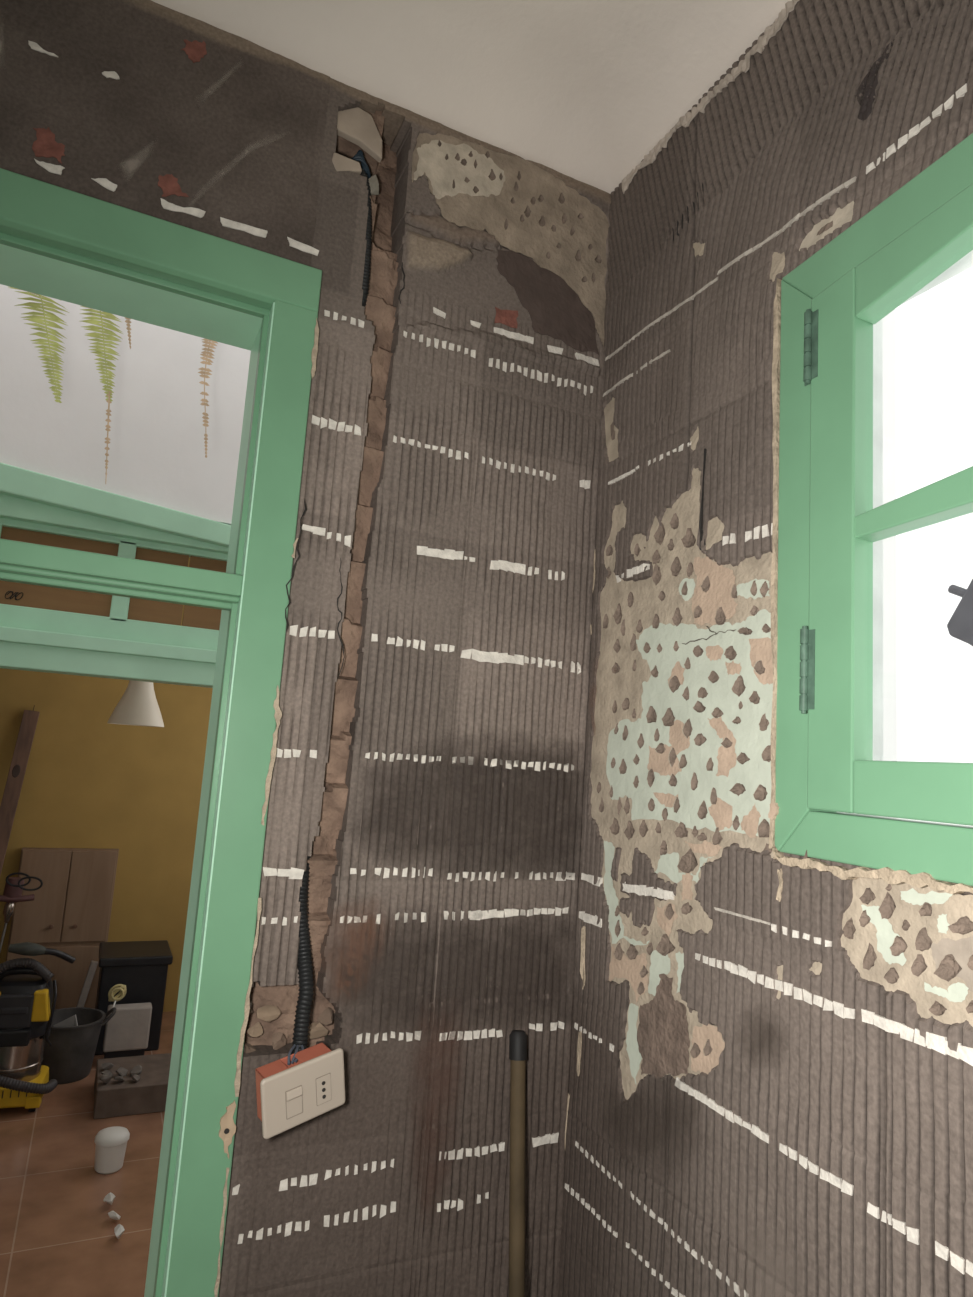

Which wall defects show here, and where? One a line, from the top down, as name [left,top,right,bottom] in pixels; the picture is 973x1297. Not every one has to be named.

crack [398,262,406,304]
spalling [412,133,609,348]
peeling [403,331,593,396]
crack [285,499,307,631]
crack [337,558,345,679]
peeling [524,201,973,1100]
peeling [365,752,574,772]
peeling [350,867,553,882]
peeling [565,1093,749,1297]
peeling [717,1105,854,1196]
peeling [867,1202,919,1245]
peeling [935,1241,973,1277]